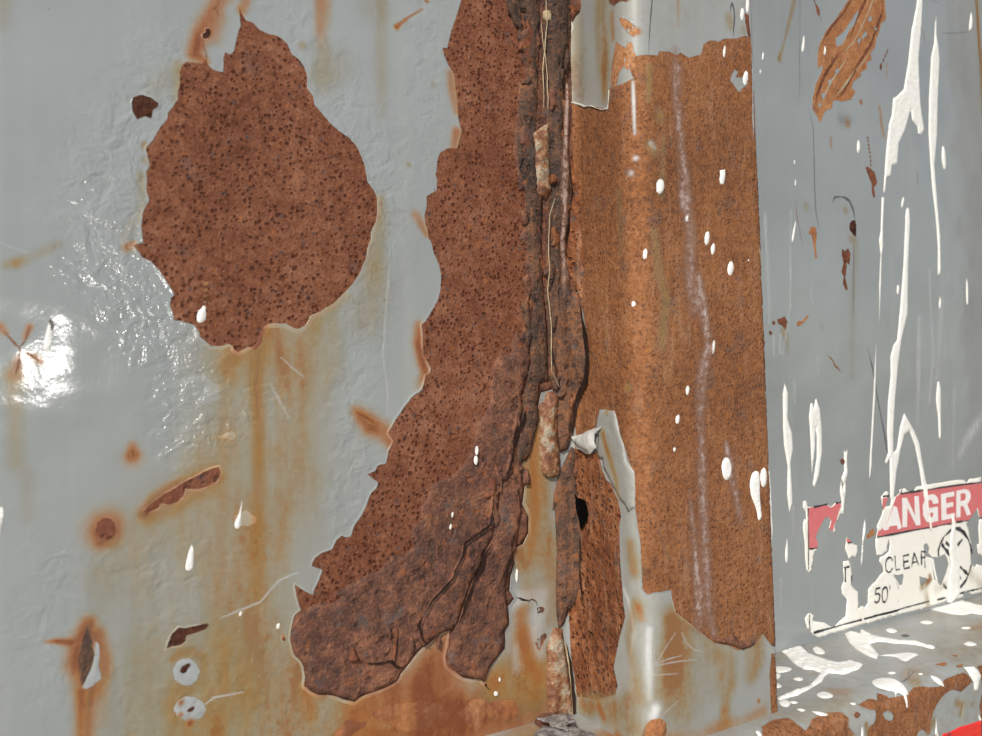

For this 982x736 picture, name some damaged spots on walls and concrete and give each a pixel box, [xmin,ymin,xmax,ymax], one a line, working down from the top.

peeling [562,90,610,139]
corrosion [287,0,557,736]
peeling [411,0,576,681]
corrosion [560,0,982,736]
crack [505,410,527,475]
corrosion [137,465,225,524]
corrosion [89,513,123,549]
crack [417,496,537,645]
corrosion [47,617,111,736]
corrosion [167,681,200,727]
corrosion [164,623,209,668]